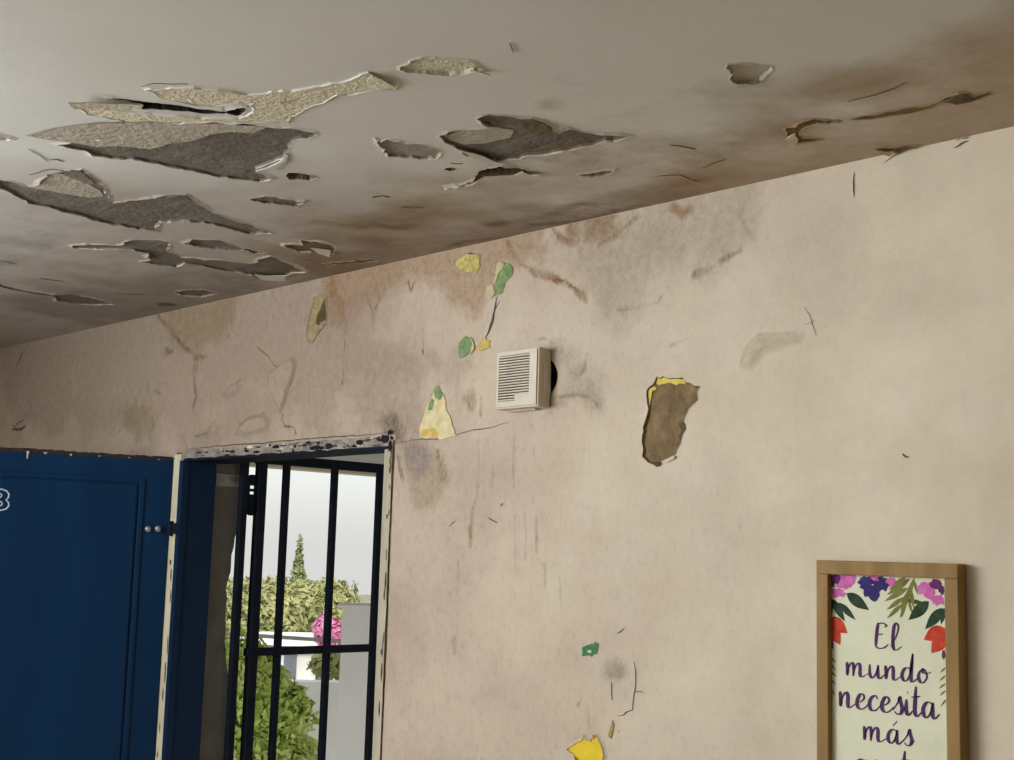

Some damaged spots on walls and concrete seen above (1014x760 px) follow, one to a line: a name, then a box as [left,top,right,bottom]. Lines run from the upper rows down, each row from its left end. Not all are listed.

peeling [0,56,491,183]
peeling [372,114,636,191]
peeling [723,62,775,88]
peeling [0,168,380,281]
peeling [454,253,481,273]
peeling [458,261,514,358]
peeling [419,385,457,440]
spalling [641,375,701,467]
peeling [184,430,395,760]
peeling [566,720,620,760]